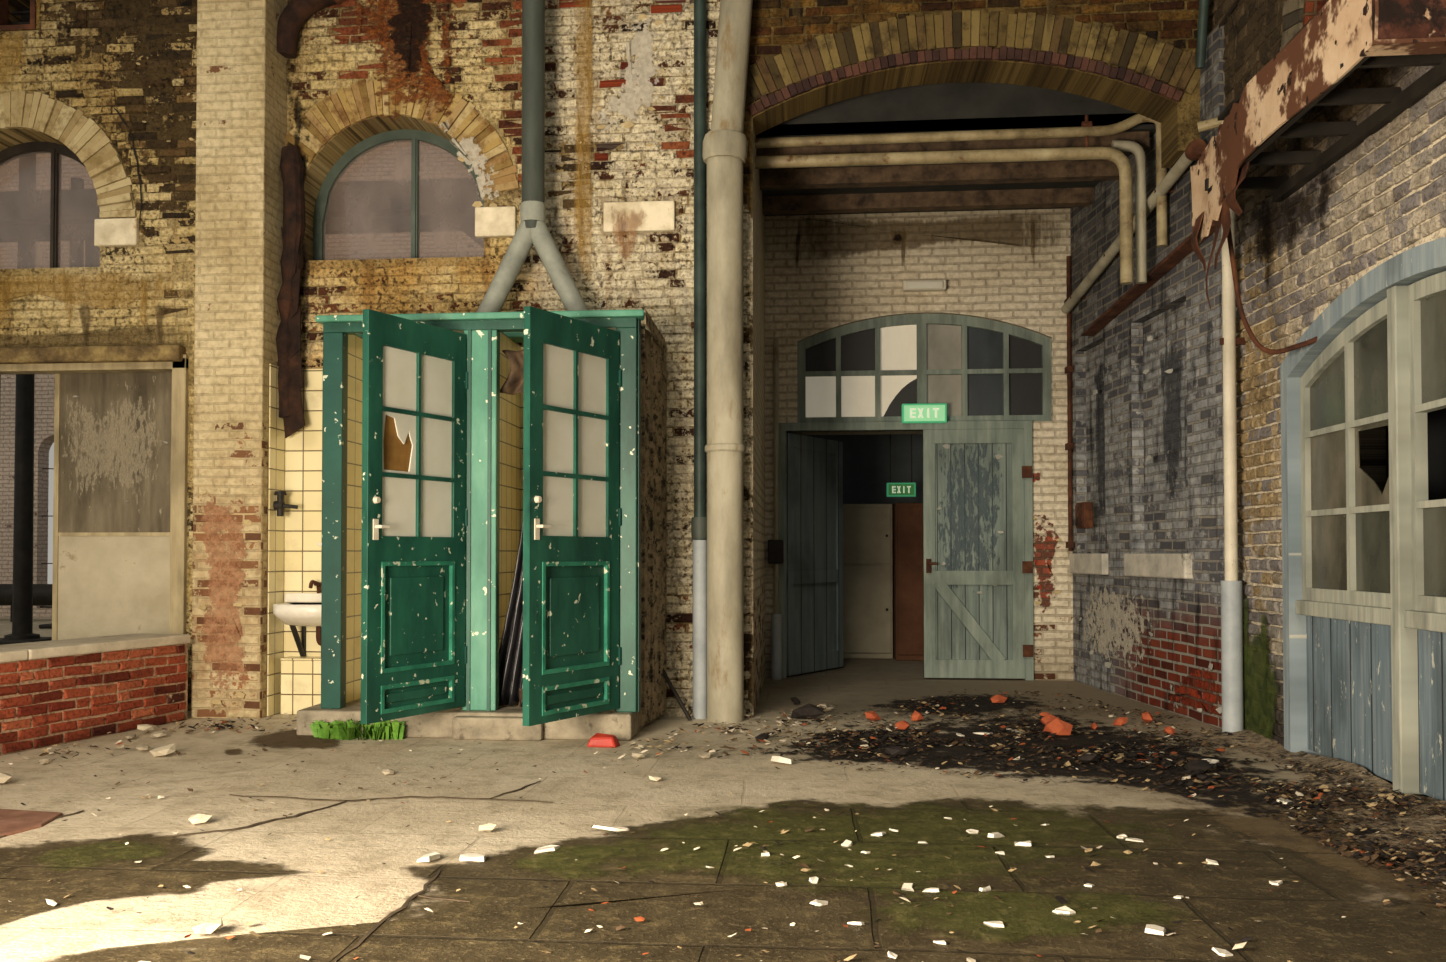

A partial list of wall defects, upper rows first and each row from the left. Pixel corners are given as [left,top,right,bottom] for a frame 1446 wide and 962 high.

spalling [328,0,391,44]
spalling [338,61,387,79]
spalling [482,0,522,82]
peeling [434,102,522,207]
leakage [1243,163,1348,302]
spalling [199,490,252,705]
crack [153,780,553,837]